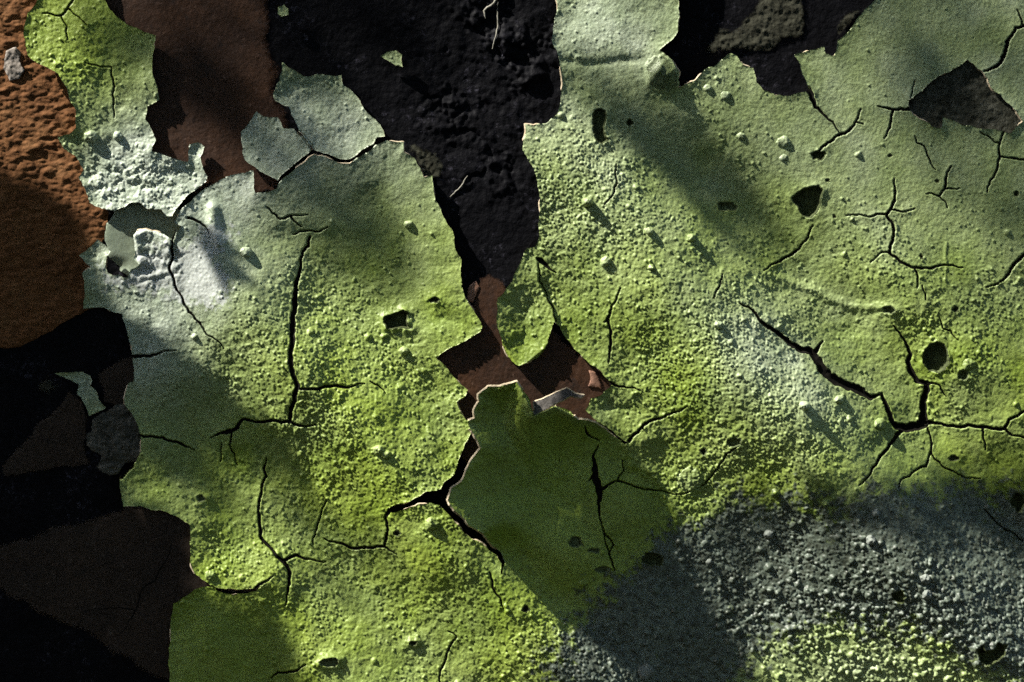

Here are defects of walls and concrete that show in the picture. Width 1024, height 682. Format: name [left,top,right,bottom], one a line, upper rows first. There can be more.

spalling [0,0,207,348]
peeling [105,0,312,193]
peeling [706,0,803,51]
crack [806,81,915,151]
crack [847,136,963,340]
crack [119,207,385,479]
peeling [437,275,611,422]
crack [740,303,1024,487]
peeling [0,506,211,681]
crack [255,457,397,606]
crack [585,407,737,570]
peeling [726,598,1024,682]